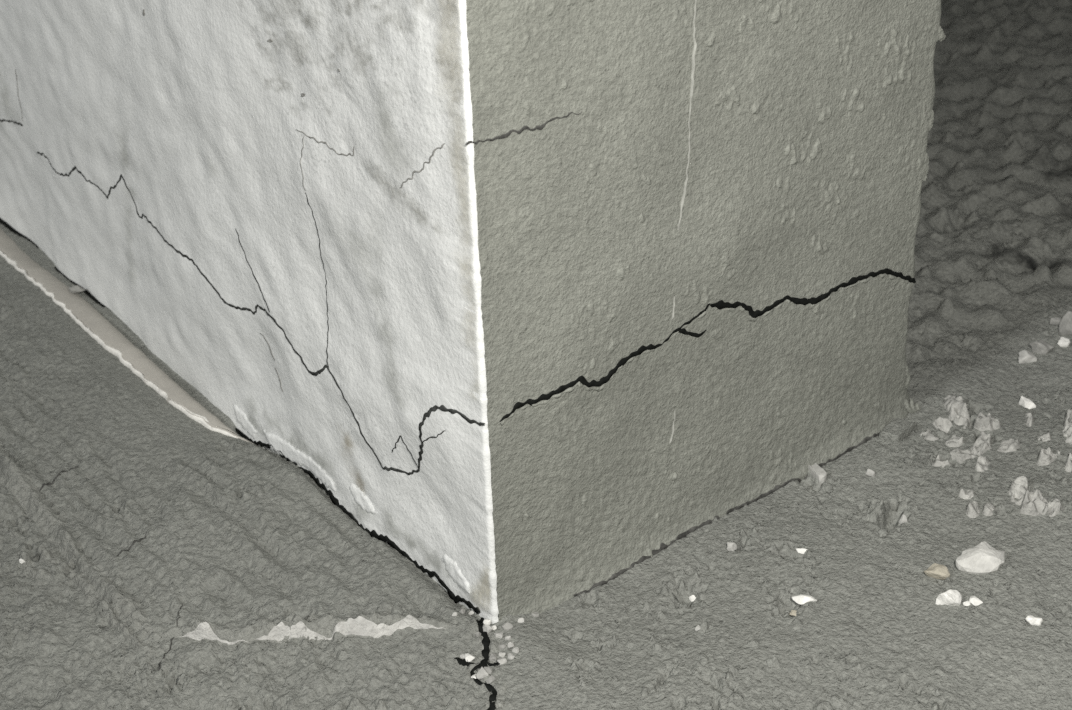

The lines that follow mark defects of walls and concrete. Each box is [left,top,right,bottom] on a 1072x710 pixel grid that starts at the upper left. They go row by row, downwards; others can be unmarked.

crack [0,69,23,126]
crack [400,112,582,188]
crack [37,129,916,475]
crack [249,438,506,710]
spalling [177,615,445,645]